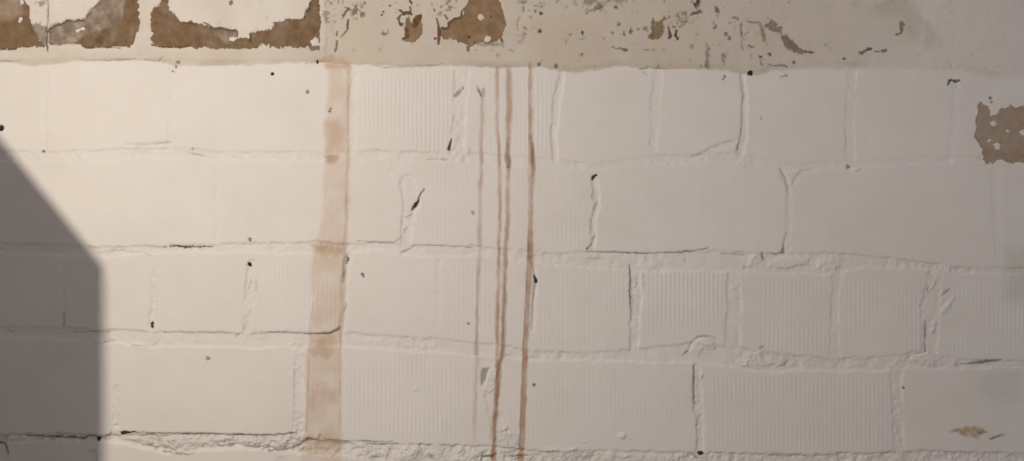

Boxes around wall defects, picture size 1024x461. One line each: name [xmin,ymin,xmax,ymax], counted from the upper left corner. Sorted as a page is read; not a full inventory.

peeling [0,0,321,51]
peeling [397,0,507,52]
peeling [649,18,679,40]
flaking render [750,20,814,54]
peeling [974,97,1024,164]